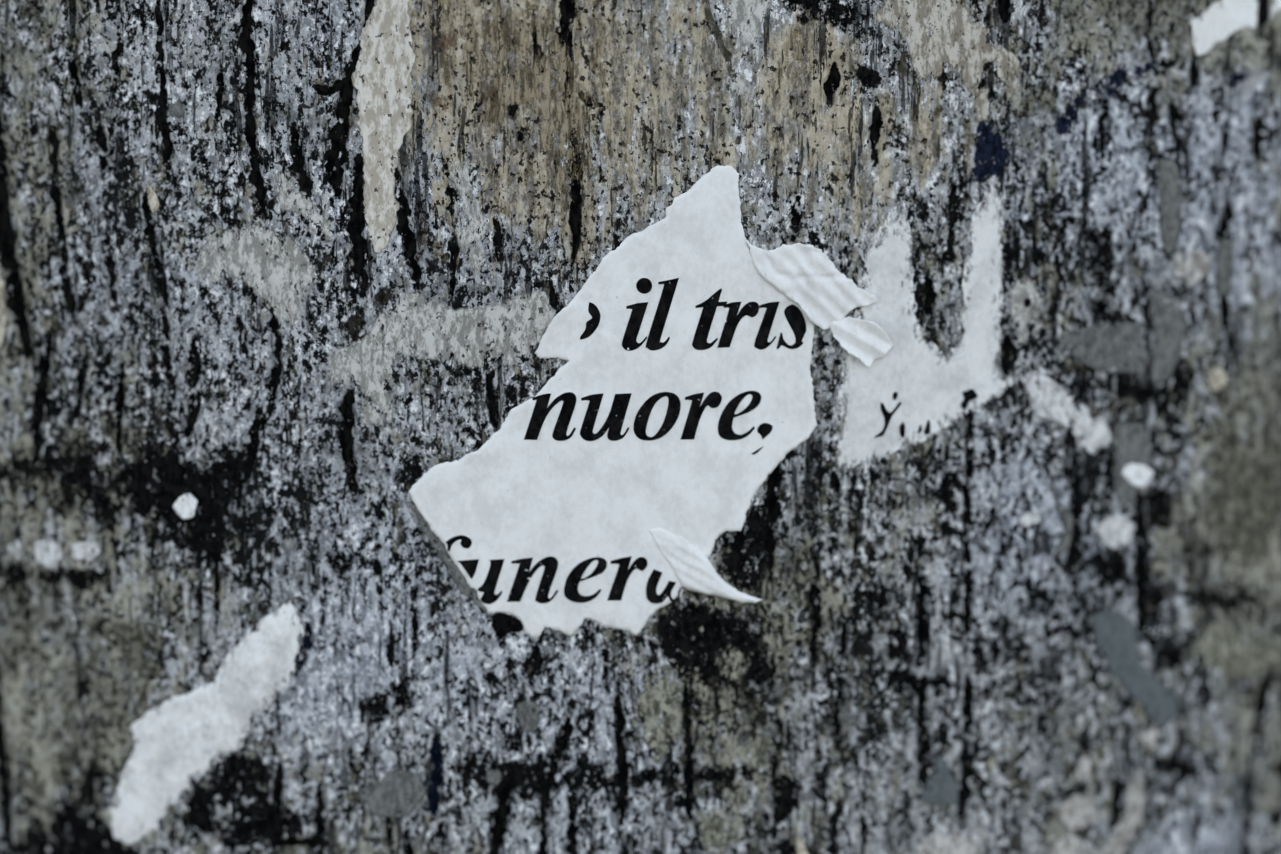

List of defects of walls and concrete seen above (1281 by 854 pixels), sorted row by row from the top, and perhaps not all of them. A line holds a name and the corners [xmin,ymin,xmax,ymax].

peeling [449,160,487,276]